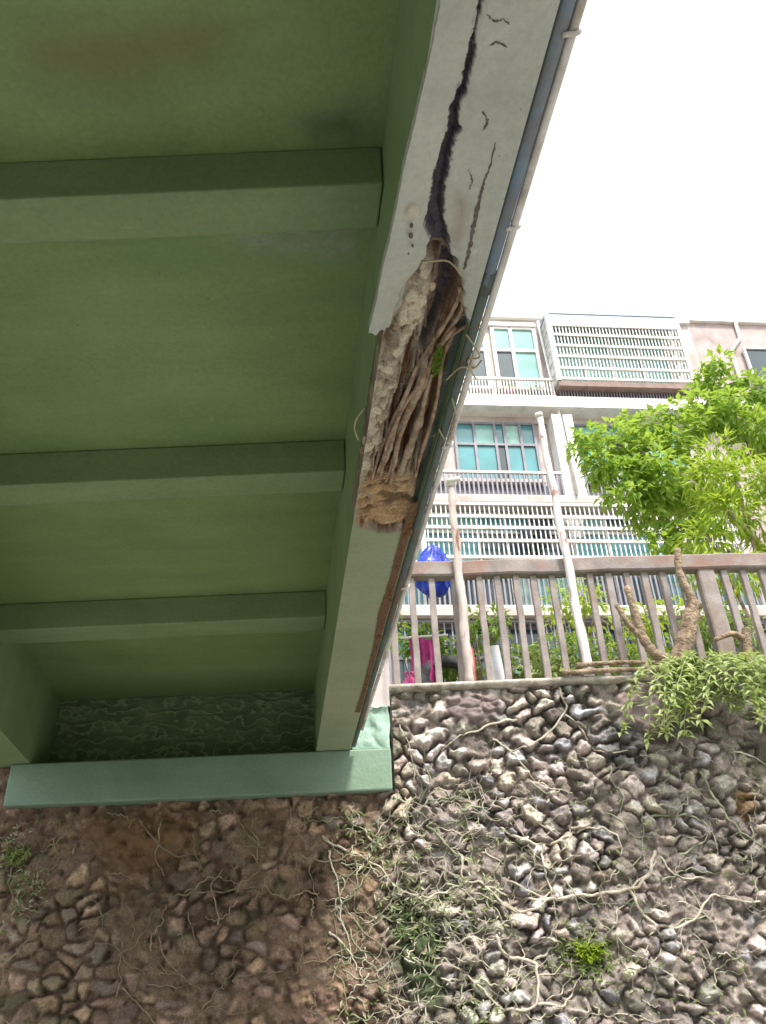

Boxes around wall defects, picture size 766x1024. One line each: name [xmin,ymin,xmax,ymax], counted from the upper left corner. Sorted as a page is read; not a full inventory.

crack [423,0,509,270]
spalling [352,222,482,536]